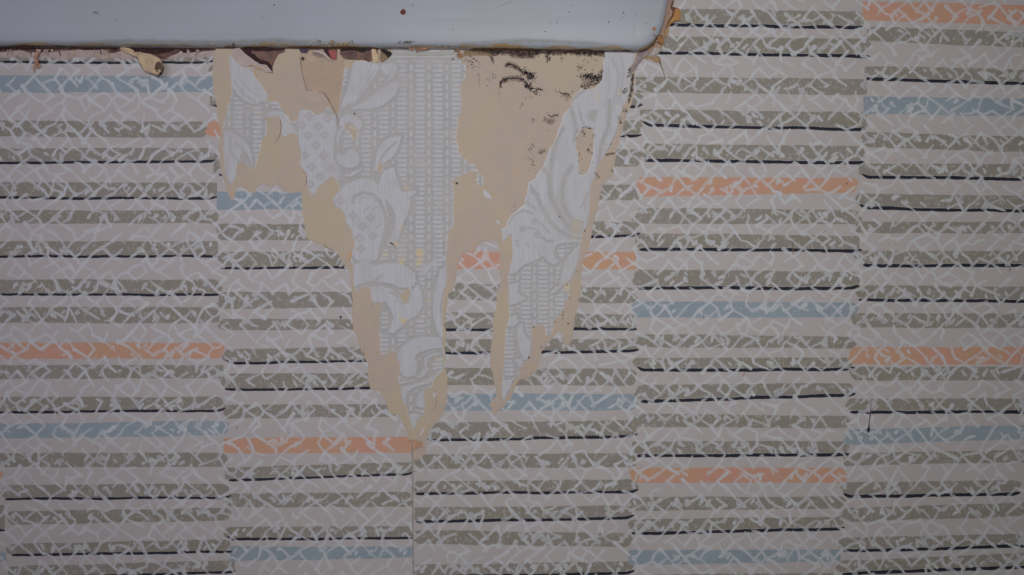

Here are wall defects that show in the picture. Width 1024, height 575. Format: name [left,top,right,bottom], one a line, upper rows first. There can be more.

damp [222,43,392,71]
peeling [299,39,555,62]
damp [412,39,661,106]